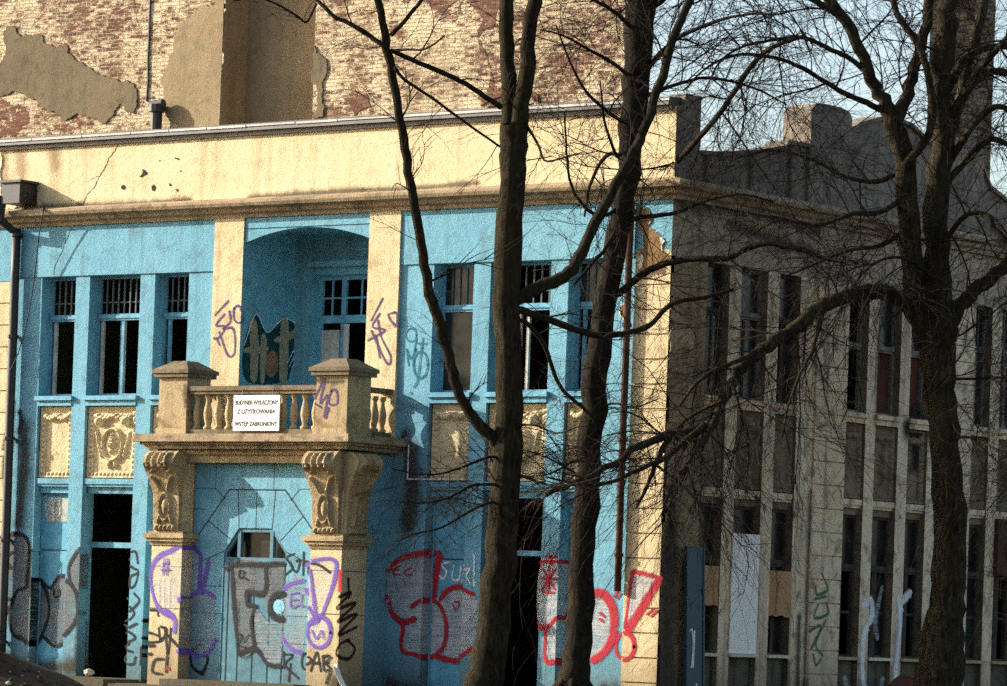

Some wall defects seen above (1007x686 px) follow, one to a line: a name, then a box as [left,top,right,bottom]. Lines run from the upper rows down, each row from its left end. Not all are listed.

flaking render [0,99,29,138]
flaking render [349,93,370,116]
flaking render [637,204,670,280]